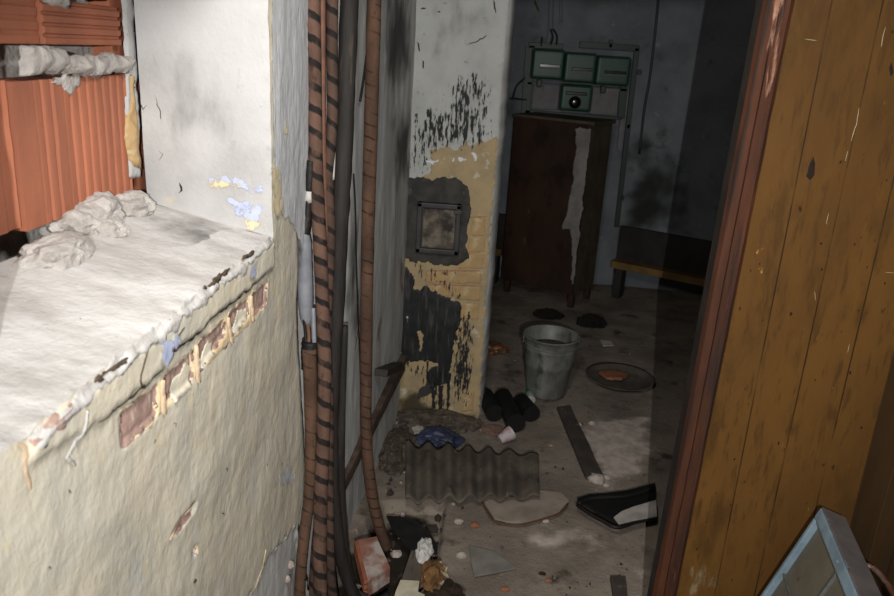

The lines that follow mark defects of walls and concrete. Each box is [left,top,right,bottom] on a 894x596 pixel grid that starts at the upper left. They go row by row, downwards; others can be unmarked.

peeling [208,0,308,249]
flaking render [29,236,273,450]
flaking render [399,137,499,419]
flaking render [170,500,198,540]
flaking render [248,525,299,596]